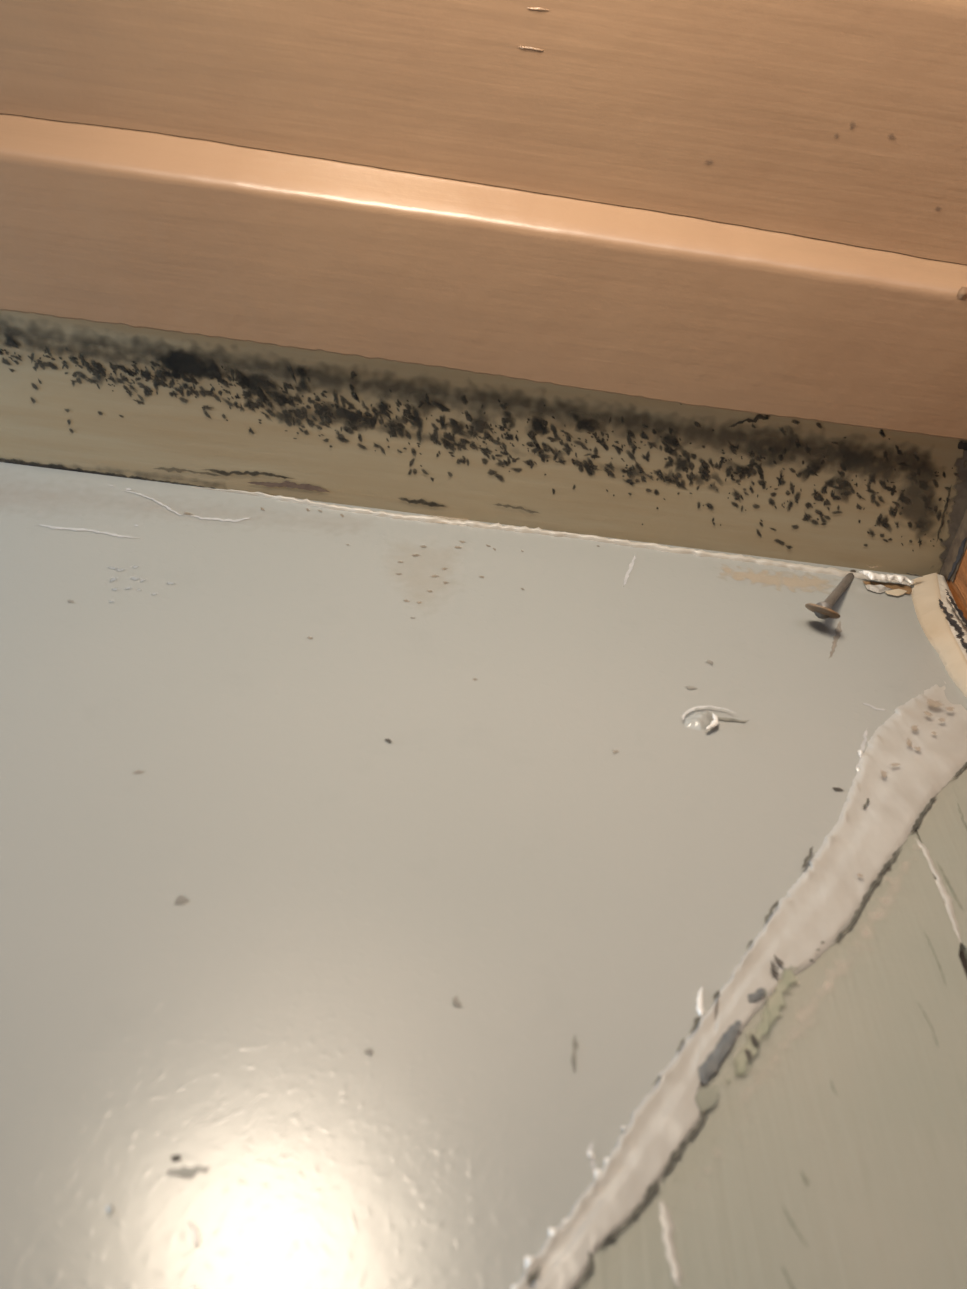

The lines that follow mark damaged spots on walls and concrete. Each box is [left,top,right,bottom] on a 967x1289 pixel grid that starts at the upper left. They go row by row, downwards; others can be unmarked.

damp [0,326,967,582]
crack [959,948,967,977]